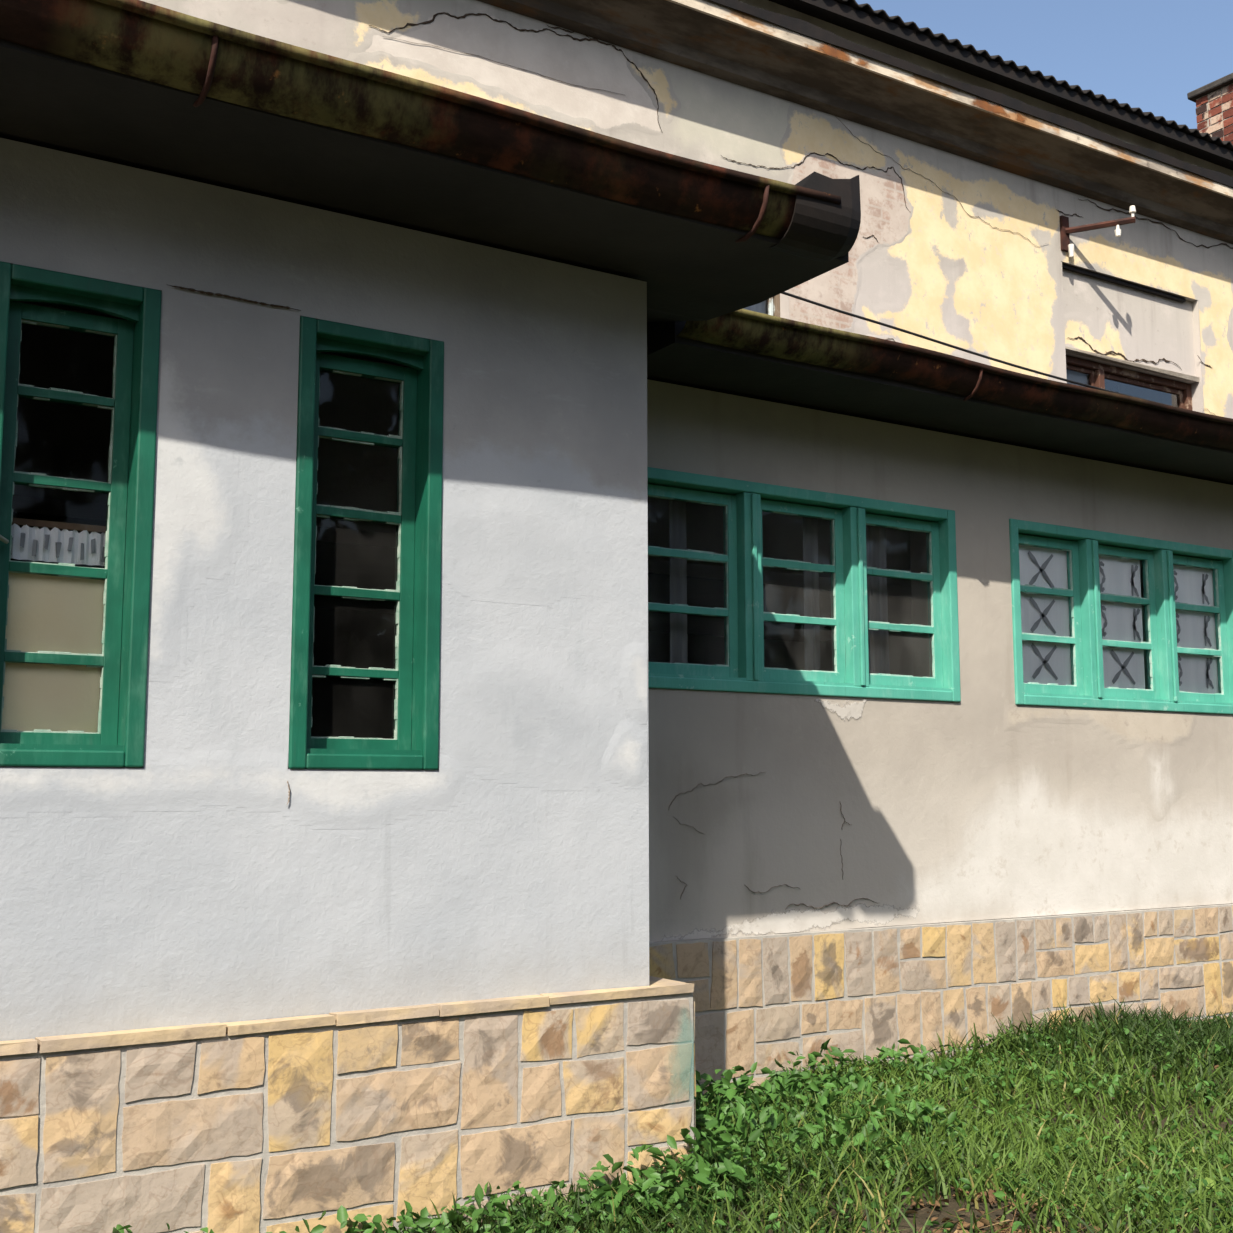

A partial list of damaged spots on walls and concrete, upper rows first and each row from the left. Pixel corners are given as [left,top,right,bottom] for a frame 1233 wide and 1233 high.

flaking render [161,0,681,136]
crack [369,12,663,133]
rust [819,43,868,66]
rust [973,99,1025,123]
crack [722,115,1048,247]
crack [1056,199,1231,248]
peeling [780,103,1233,418]
crack [1067,336,1212,370]
crack [668,772,765,834]
crack [745,803,876,910]
flaking render [662,903,920,941]